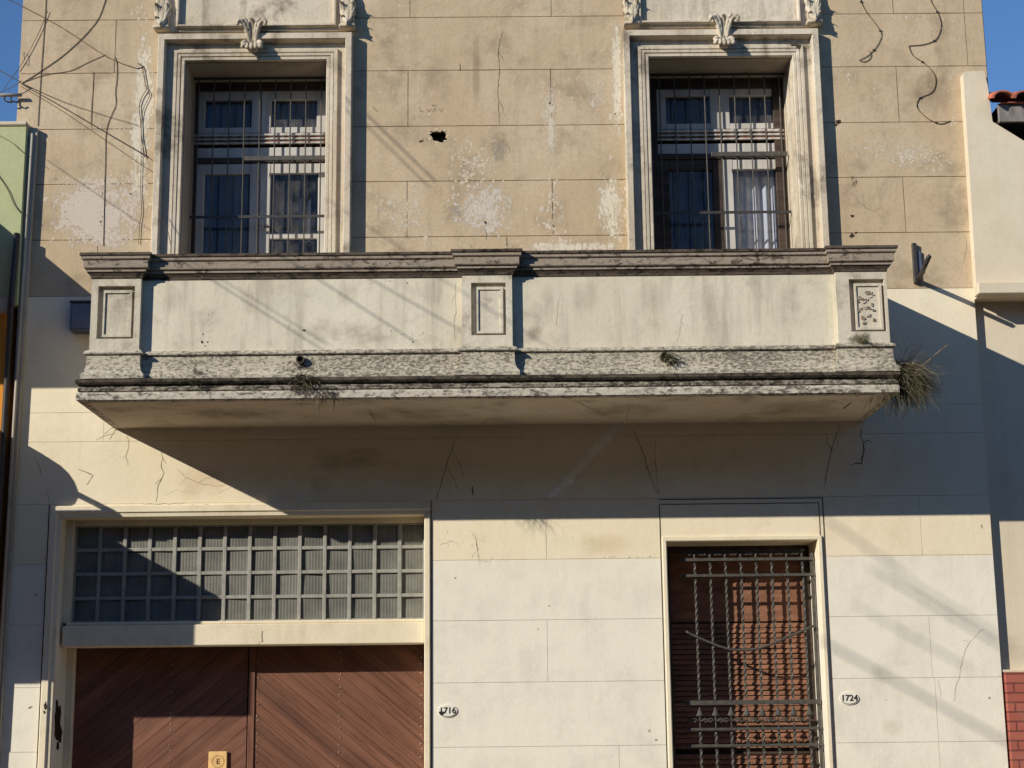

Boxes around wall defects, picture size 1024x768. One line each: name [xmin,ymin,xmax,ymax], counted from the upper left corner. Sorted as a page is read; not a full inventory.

peeling [40,3,156,254]
crack [496,32,504,126]
peeling [374,21,627,251]
crack [153,452,228,505]
crack [547,397,659,498]
crack [824,394,872,486]